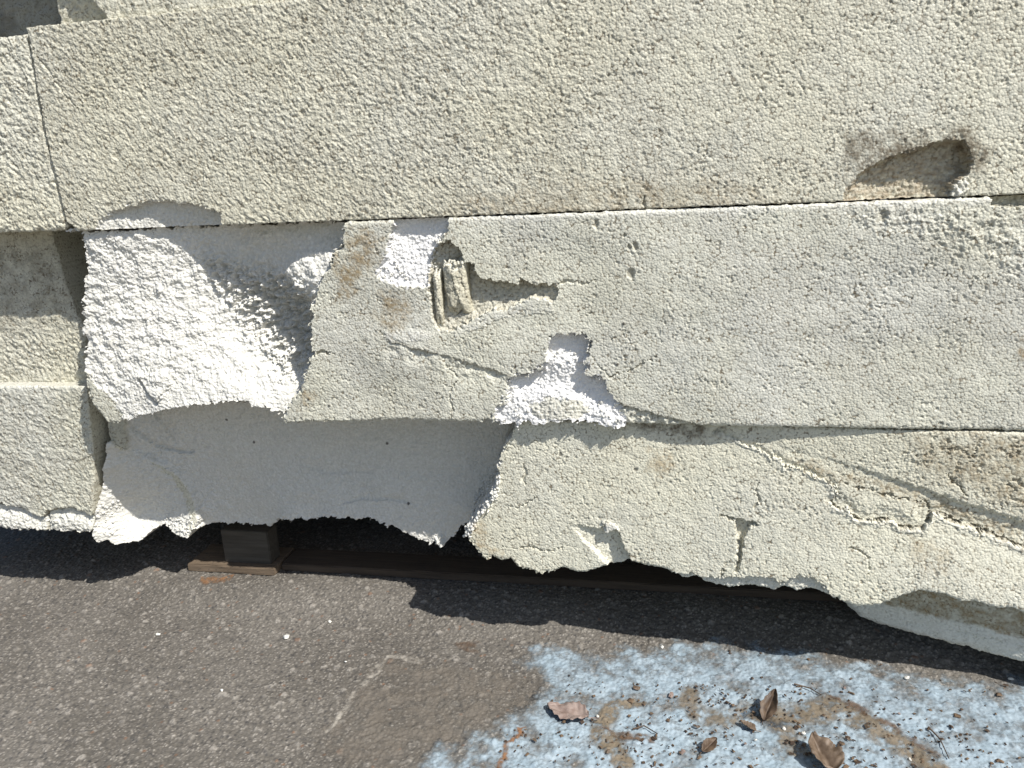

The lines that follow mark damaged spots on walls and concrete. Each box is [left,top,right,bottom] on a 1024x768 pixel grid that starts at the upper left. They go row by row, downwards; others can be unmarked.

spalling [0,198,627,548]
crack [720,481,762,575]
crack [830,472,1024,547]